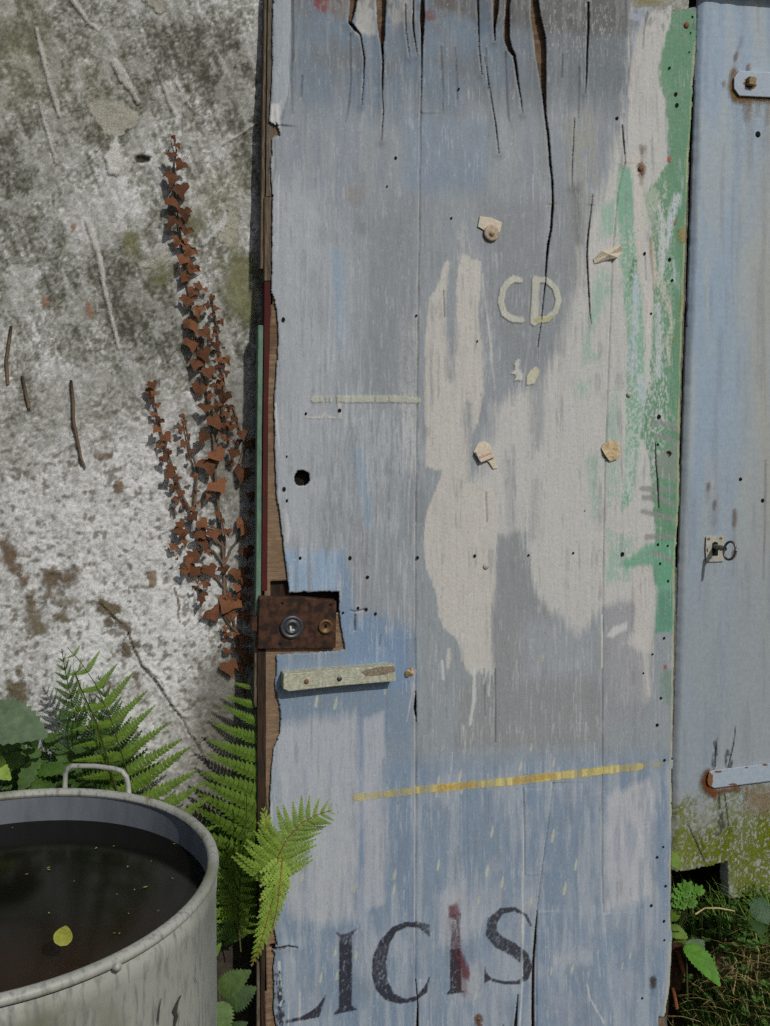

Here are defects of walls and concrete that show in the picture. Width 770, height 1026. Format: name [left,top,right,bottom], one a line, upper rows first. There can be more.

crack [111,616,206,762]
corrosion [702,769,740,798]